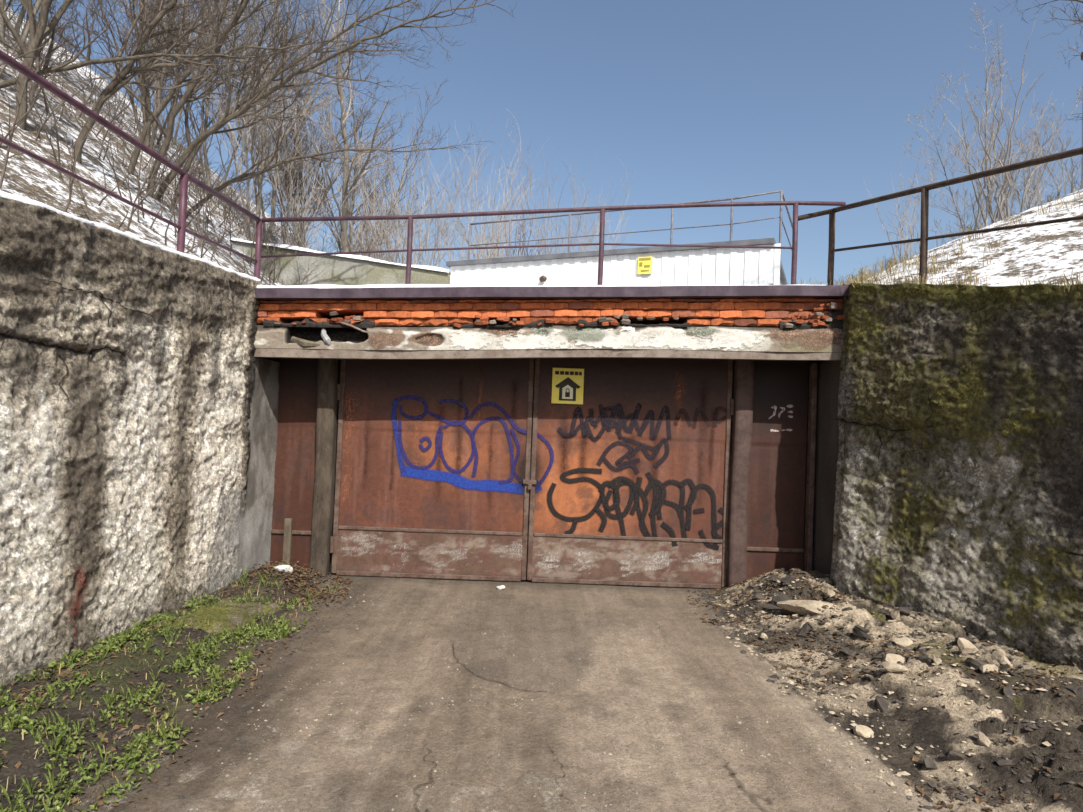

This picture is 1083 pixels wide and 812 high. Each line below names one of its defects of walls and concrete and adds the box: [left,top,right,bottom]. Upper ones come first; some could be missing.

crack [0,263,151,403]
spalling [263,311,375,347]
peeling [449,314,766,351]
water stain [0,294,171,636]
water stain [837,448,864,564]
water stain [874,472,888,545]
water stain [968,442,1019,536]
water stain [929,528,992,589]